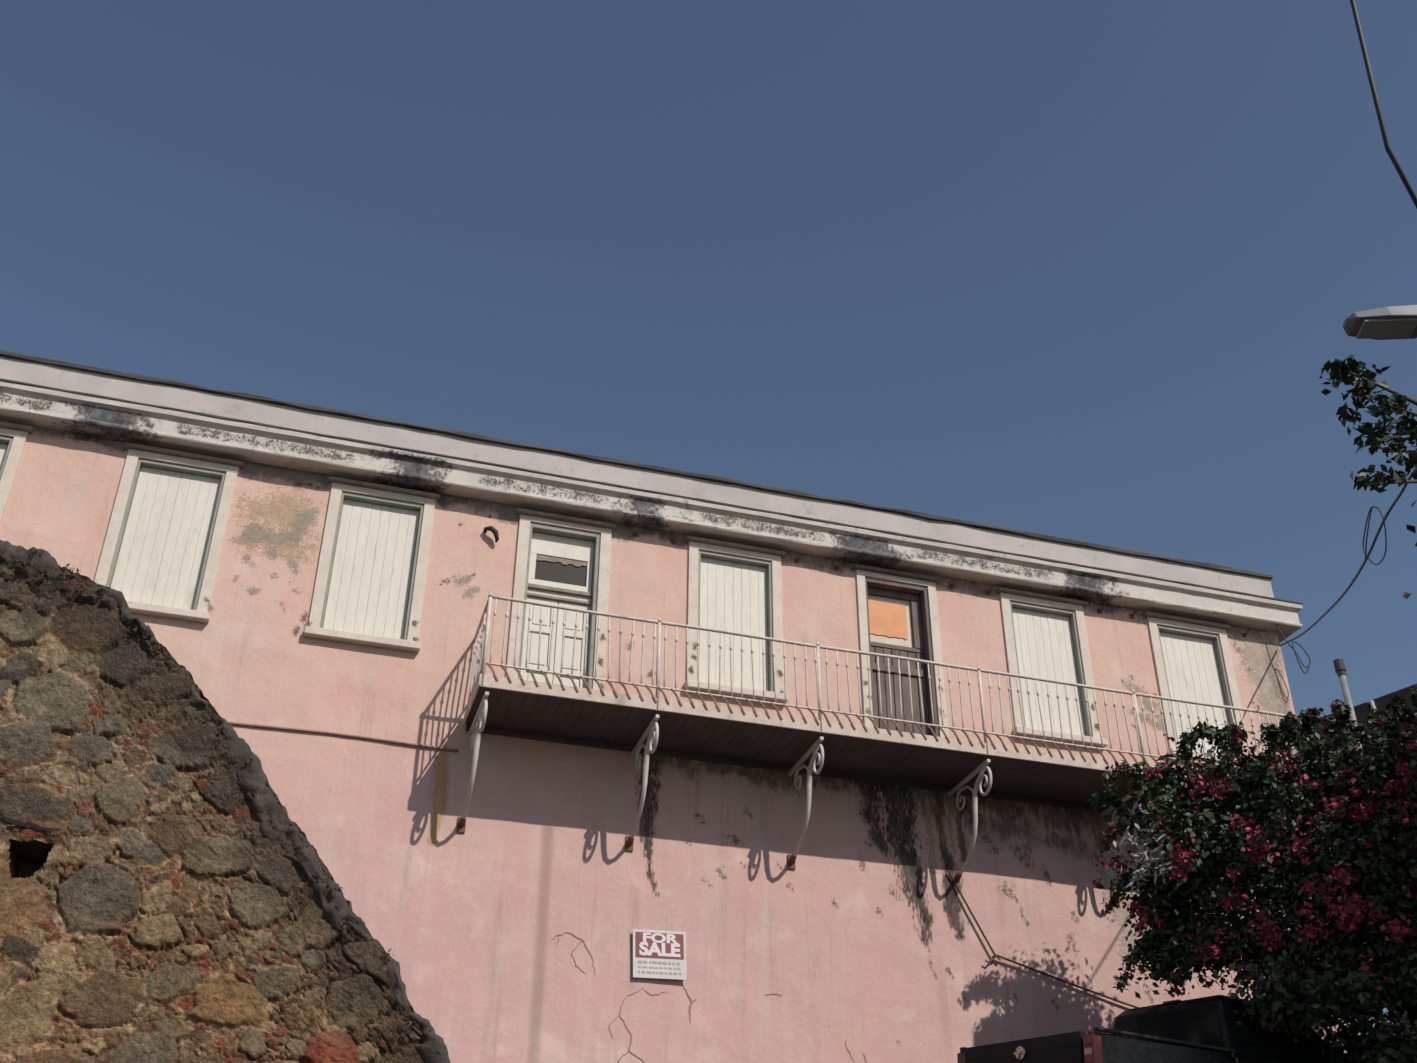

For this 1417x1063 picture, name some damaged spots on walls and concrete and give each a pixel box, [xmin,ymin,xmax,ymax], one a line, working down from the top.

spalling [229,482,320,612]
damp [0,391,1263,634]
damp [637,754,1112,979]
crack [554,932,596,974]
crack [609,983,697,1063]